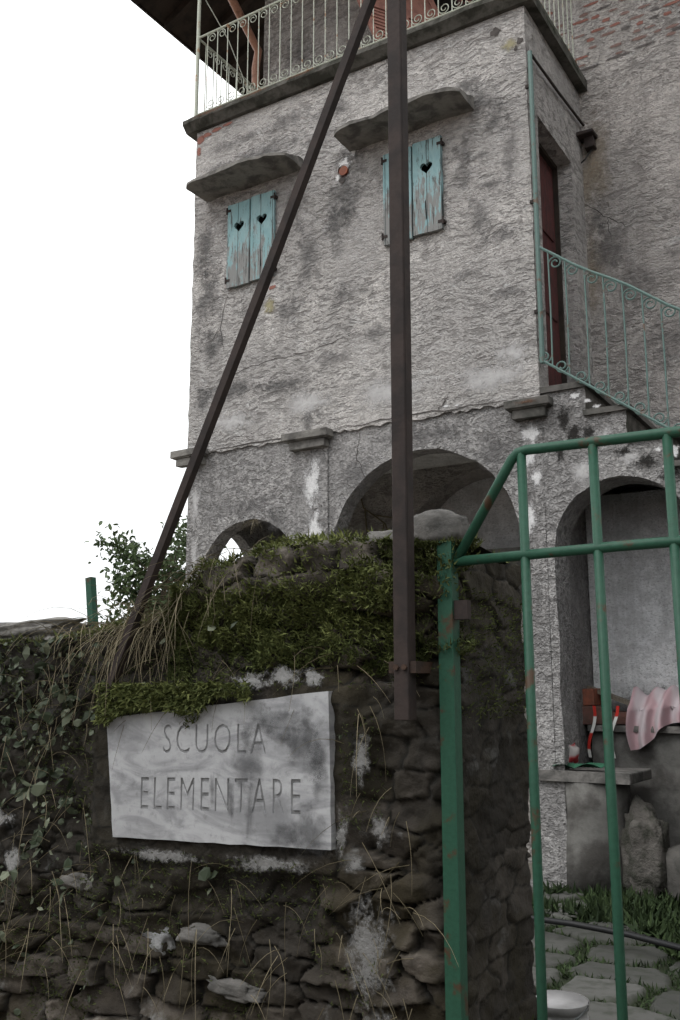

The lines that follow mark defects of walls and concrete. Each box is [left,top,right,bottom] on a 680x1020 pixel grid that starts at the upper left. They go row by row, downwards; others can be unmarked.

spalling [335,151,355,183]
crack [208,438,281,452]
crack [338,396,506,478]
peeling [520,423,542,488]
damp [557,406,594,461]
peeling [303,459,322,537]
peeling [528,506,537,534]